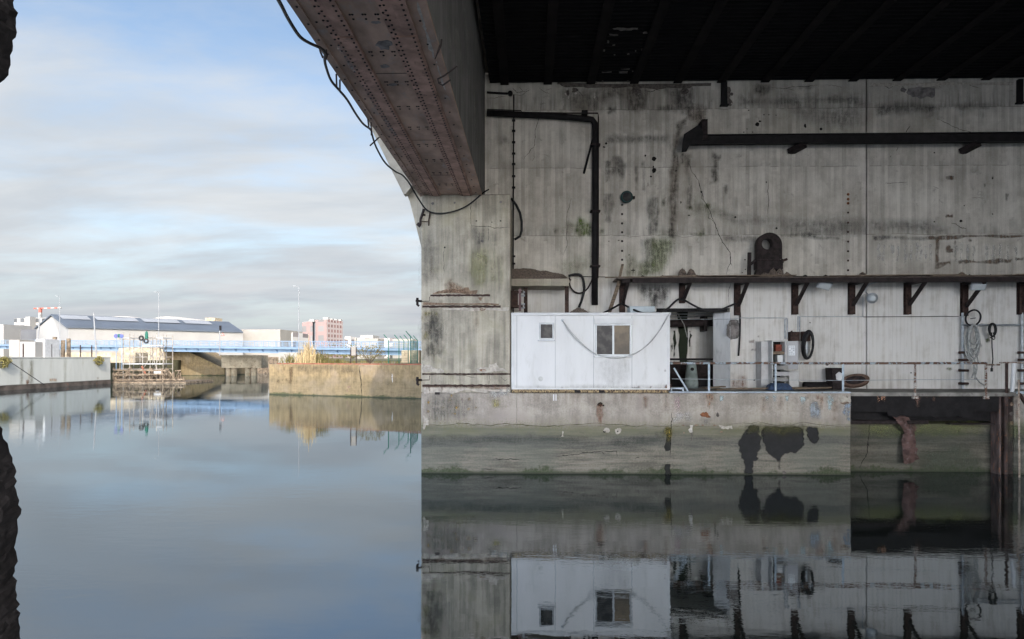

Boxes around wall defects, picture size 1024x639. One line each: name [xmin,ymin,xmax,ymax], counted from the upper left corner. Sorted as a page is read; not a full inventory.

crack [605,164,732,298]
damp [738,425,819,474]